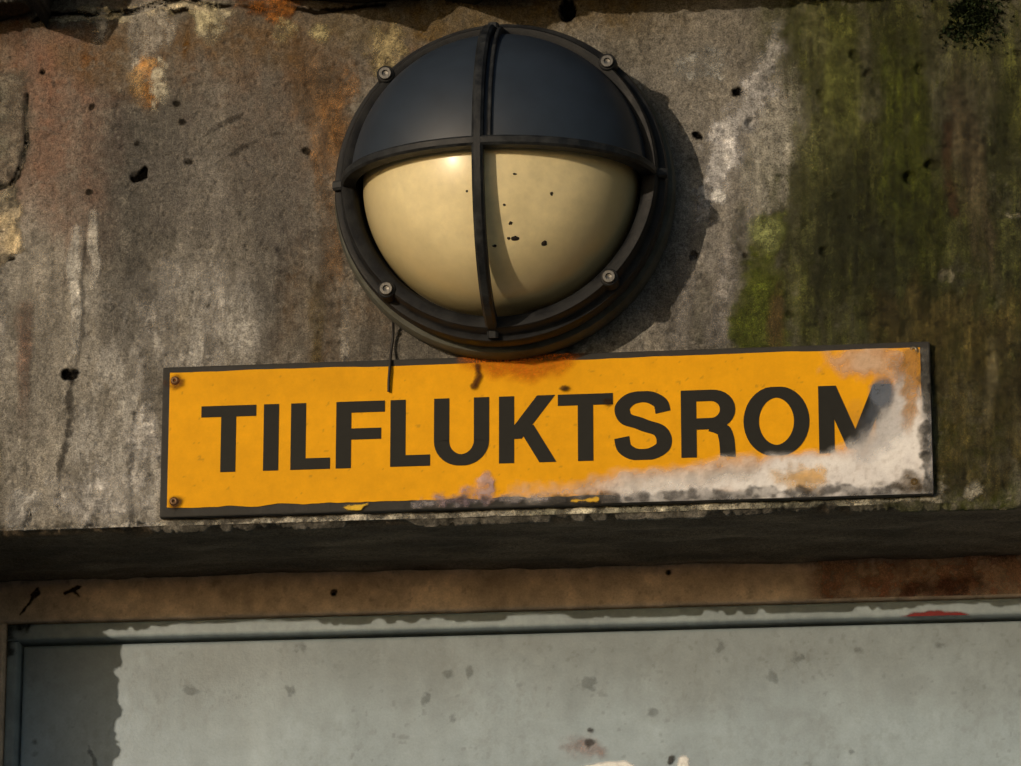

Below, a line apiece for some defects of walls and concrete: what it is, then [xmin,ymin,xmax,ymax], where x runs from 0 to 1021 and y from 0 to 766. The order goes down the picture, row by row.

corrosion [131,57,167,108]
water stain [698,41,808,348]
water stain [819,51,938,326]
corrosion [811,555,1021,599]